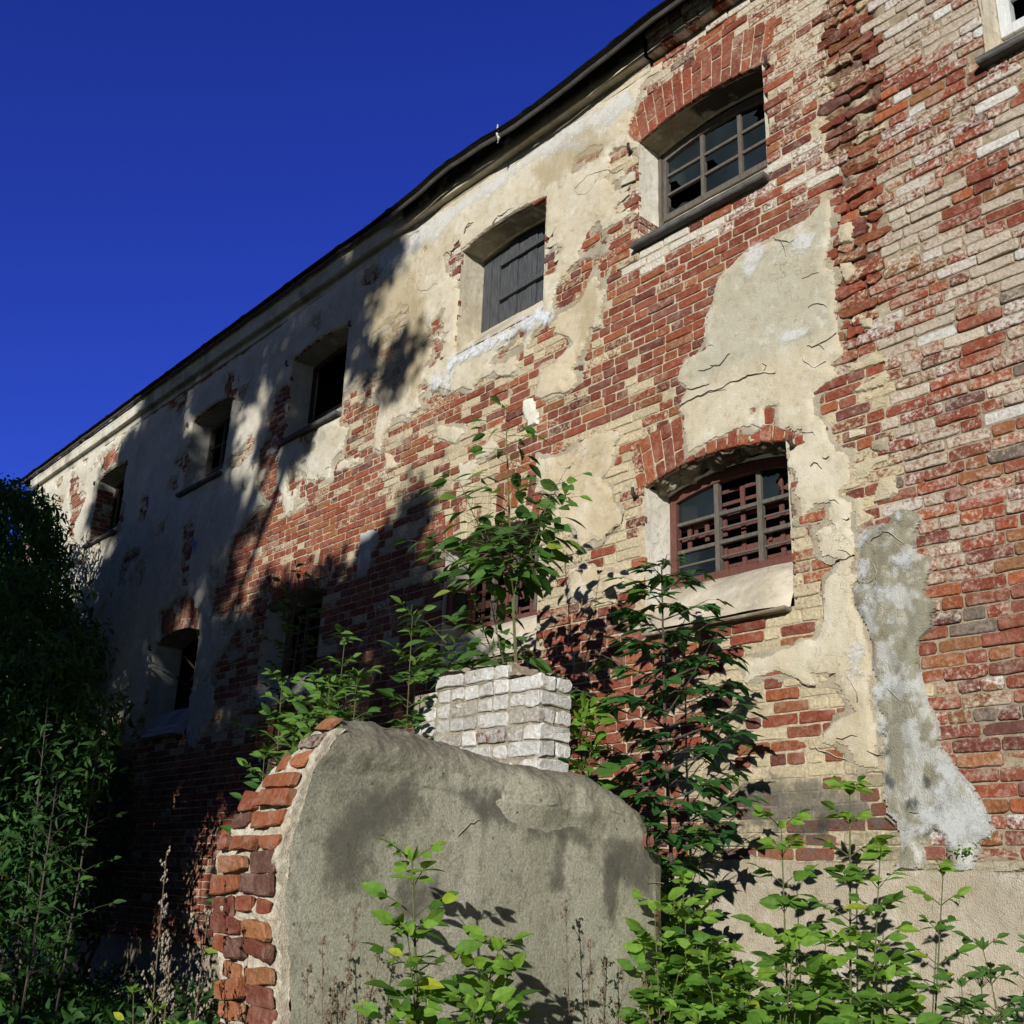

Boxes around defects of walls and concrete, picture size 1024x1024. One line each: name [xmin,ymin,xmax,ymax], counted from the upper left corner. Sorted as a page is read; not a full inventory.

flaking render [622,0,892,348]
water stain [430,306,550,389]
crack [680,344,776,407]
crack [802,332,837,368]
flaking render [88,147,1024,945]
crack [821,499,903,583]
crack [796,672,858,702]
crack [813,734,881,760]
water stain [923,760,956,796]
water stain [605,861,618,913]